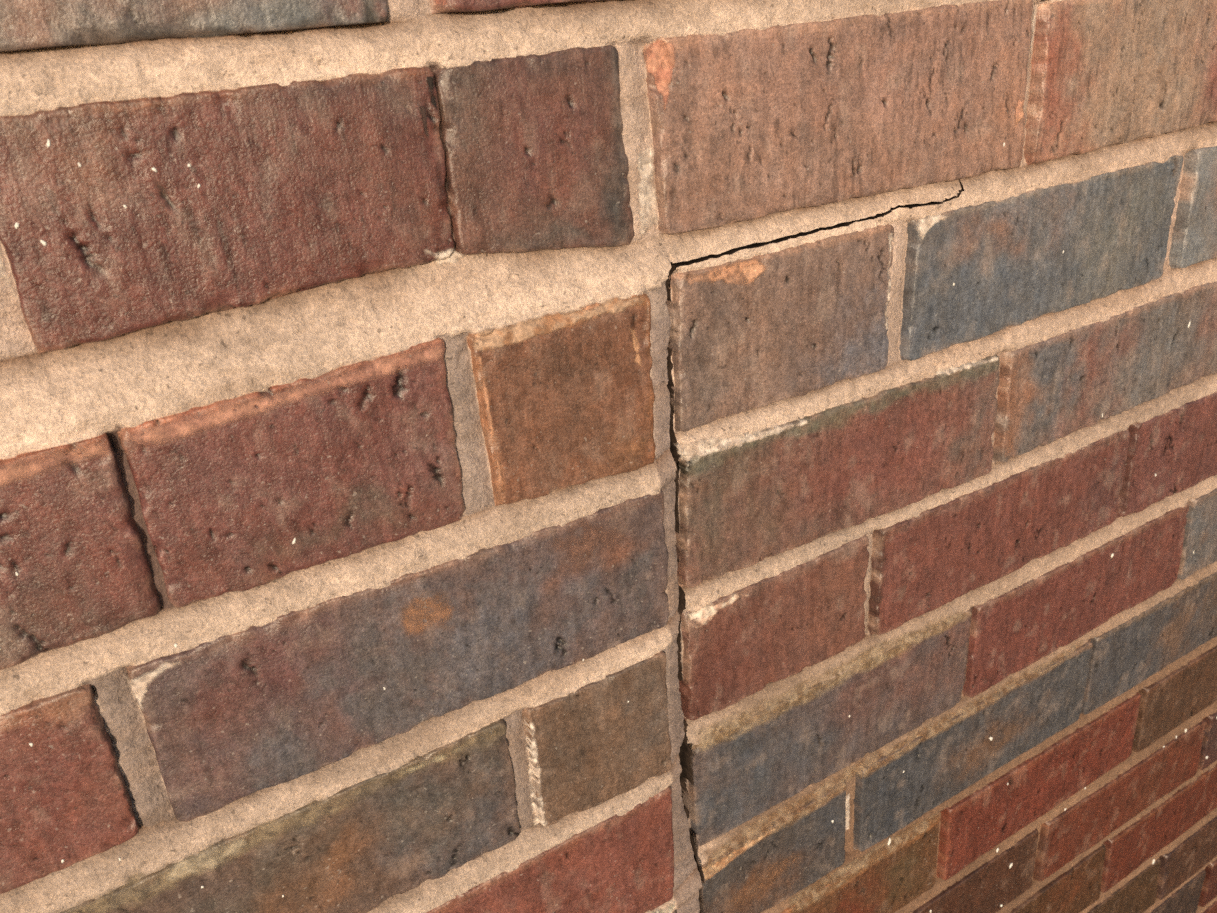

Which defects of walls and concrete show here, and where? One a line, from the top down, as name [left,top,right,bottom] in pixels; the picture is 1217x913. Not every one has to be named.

crack [665,180,962,301]
crack [667,342,685,681]
crack [679,719,704,913]